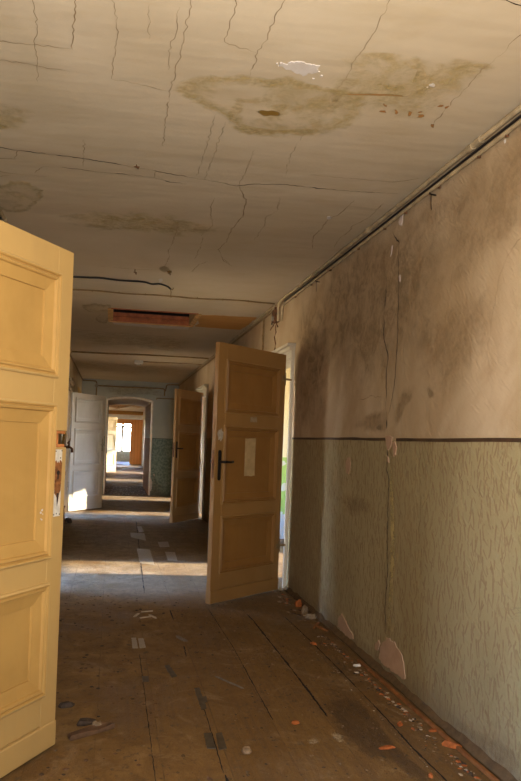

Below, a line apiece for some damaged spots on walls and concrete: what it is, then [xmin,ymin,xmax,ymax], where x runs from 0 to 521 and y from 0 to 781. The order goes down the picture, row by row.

crack [0,0,76,79]
crack [111,0,192,141]
crack [224,0,285,73]
peeling [276,61,323,80]
crack [328,0,390,100]
crack [0,120,418,272]
spalling [375,638,406,680]